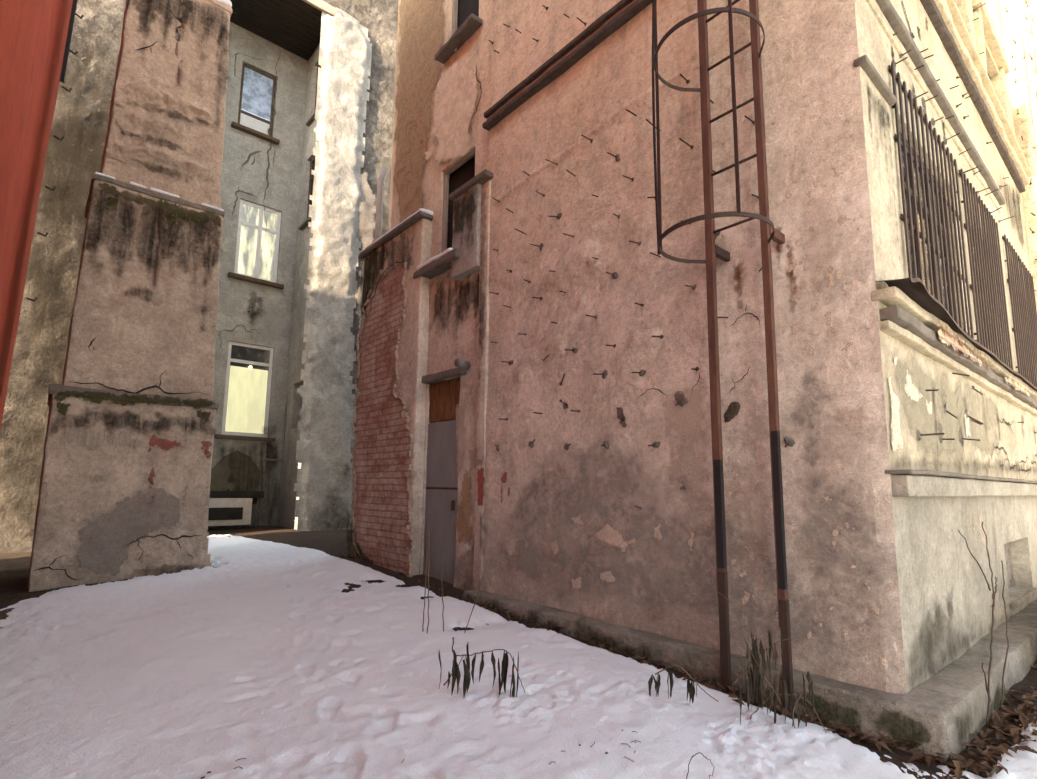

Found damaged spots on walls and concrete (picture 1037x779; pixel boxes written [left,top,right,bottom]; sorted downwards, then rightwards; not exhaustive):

water stain [140,12,181,36]
crack [232,53,280,237]
flaking render [938,329,983,366]
crack [68,370,209,395]
flaking render [313,171,415,577]
flaking render [1006,377,1029,397]
peeling [888,357,998,459]
crack [992,413,1037,472]
crack [125,534,201,561]
crack [34,555,79,580]